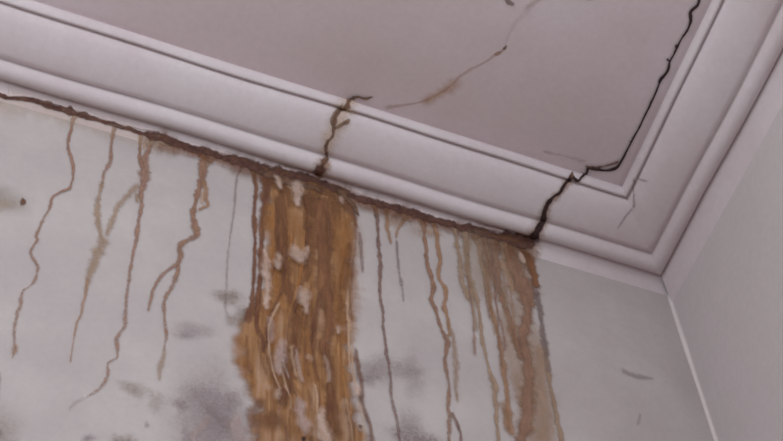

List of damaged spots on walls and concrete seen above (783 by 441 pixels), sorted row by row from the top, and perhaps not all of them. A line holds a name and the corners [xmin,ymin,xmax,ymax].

crack [0,0,701,254]